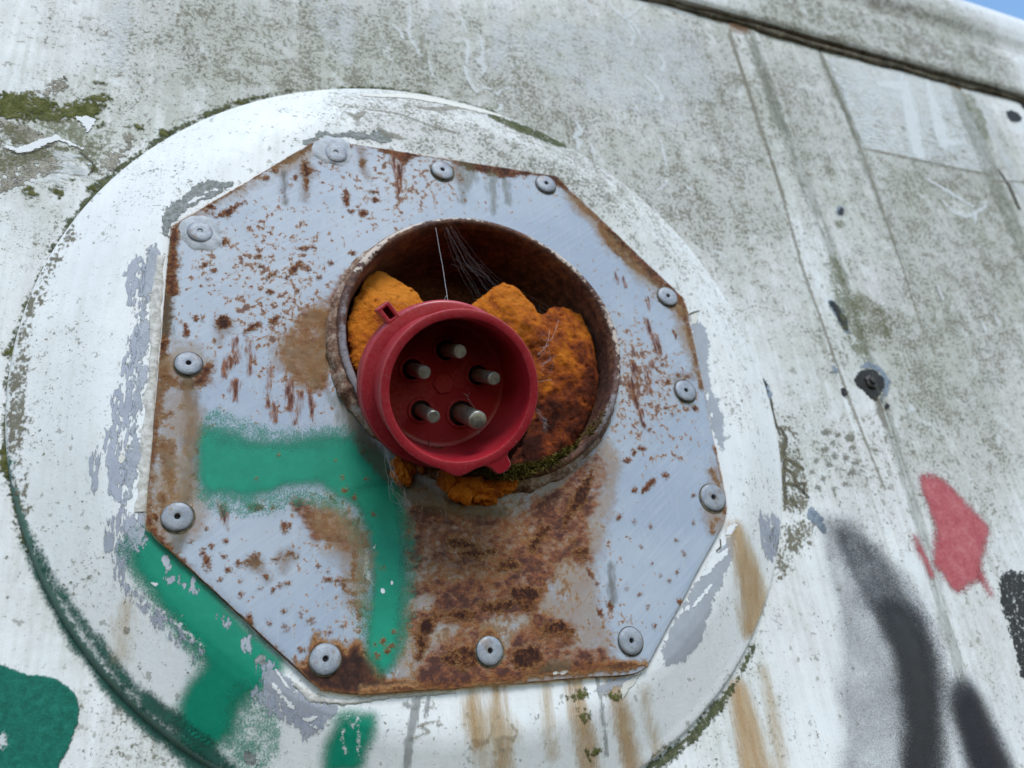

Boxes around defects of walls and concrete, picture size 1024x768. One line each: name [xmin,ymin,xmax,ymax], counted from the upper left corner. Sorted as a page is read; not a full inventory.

peeling [0,76,144,199]
rust [200,139,322,218]
rust [256,246,334,295]
rust [372,148,704,431]
peeling [89,179,234,664]
rust [146,216,298,594]
rust [281,498,371,617]
rust [295,454,649,768]
rust [631,472,669,494]
peeling [660,523,738,666]
peeling [759,509,781,563]
peeling [621,672,642,699]